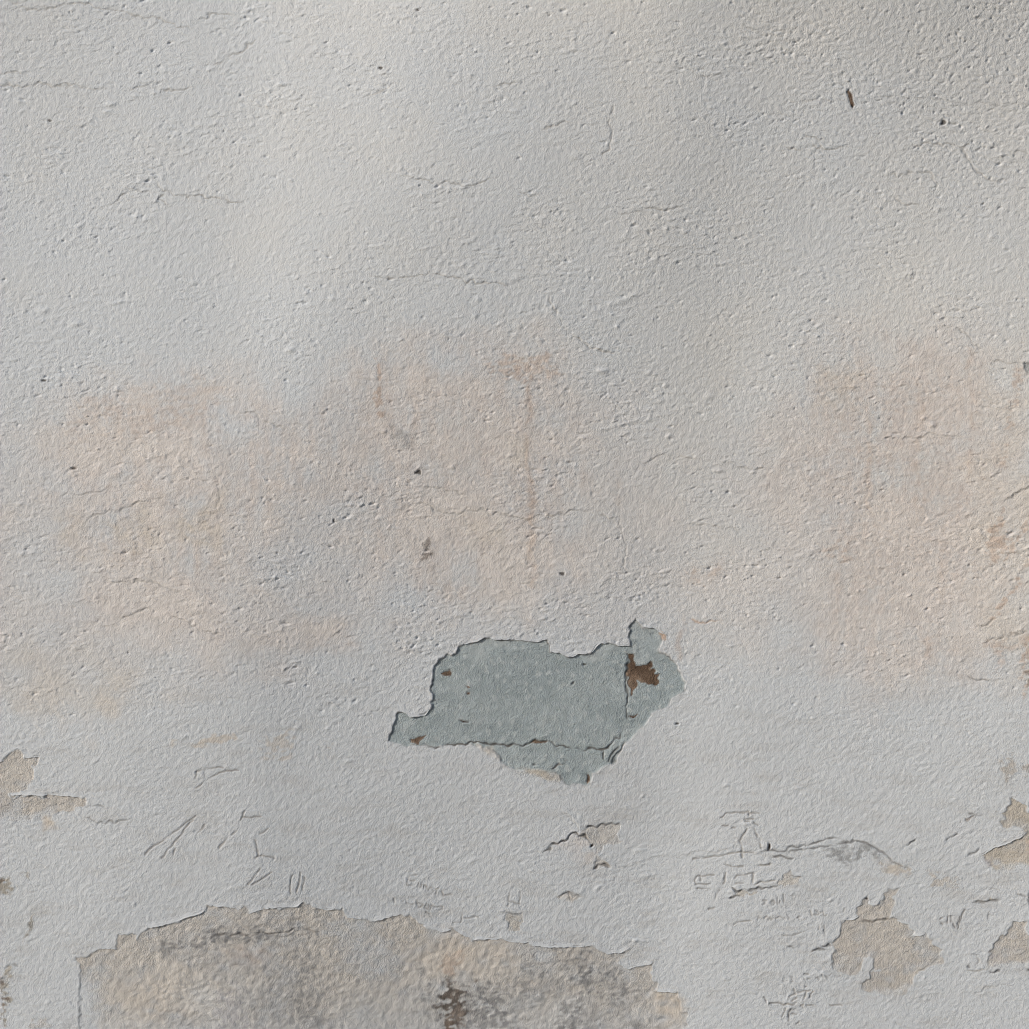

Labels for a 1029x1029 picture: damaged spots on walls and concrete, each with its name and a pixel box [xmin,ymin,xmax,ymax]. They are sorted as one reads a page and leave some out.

peeling [387,618,687,787]
peeling [0,749,88,834]
peeling [74,899,689,1029]
crack [757,836,912,879]
peeling [810,887,946,1000]
peeling [972,888,1001,921]
peeling [946,751,1029,878]
peeling [964,918,1029,974]